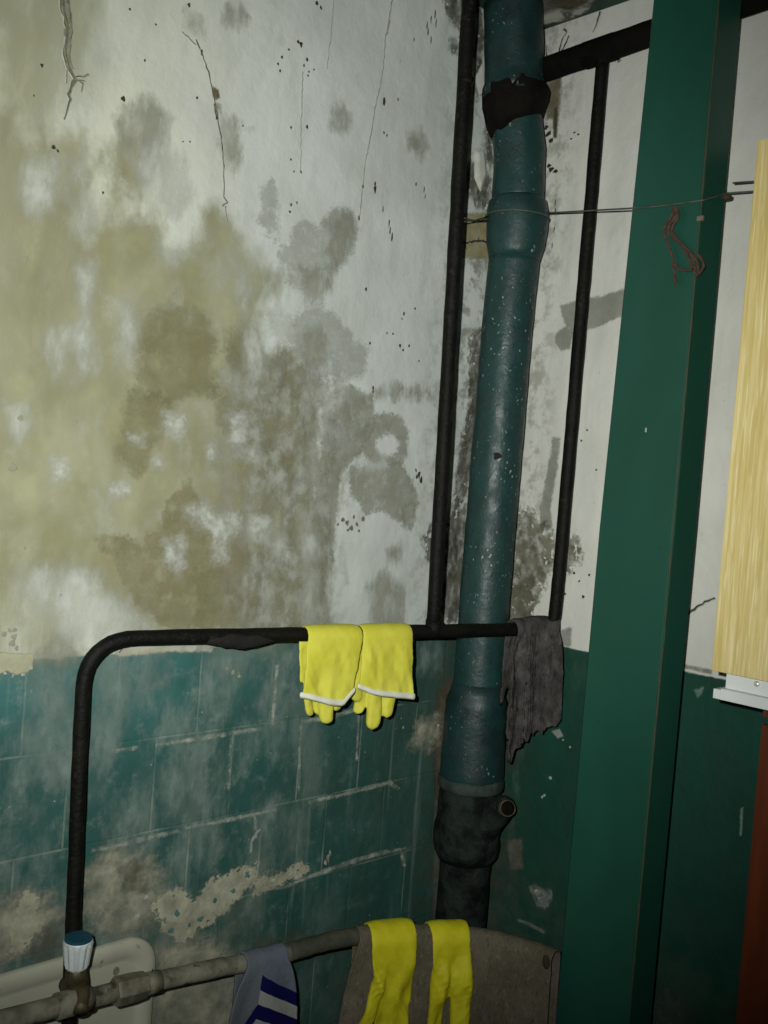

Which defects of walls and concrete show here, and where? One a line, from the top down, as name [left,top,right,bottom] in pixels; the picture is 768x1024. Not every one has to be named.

crack [58,0,89,120]
water stain [116,103,190,209]
crack [182,31,228,222]
crack [359,0,393,217]
water stain [556,290,624,350]
water stain [0,135,420,662]
water stain [441,328,481,623]
water stain [509,438,583,619]
water stain [560,628,571,646]
peeling [317,782,400,801]
peeling [0,886,64,962]
peeling [82,801,406,947]